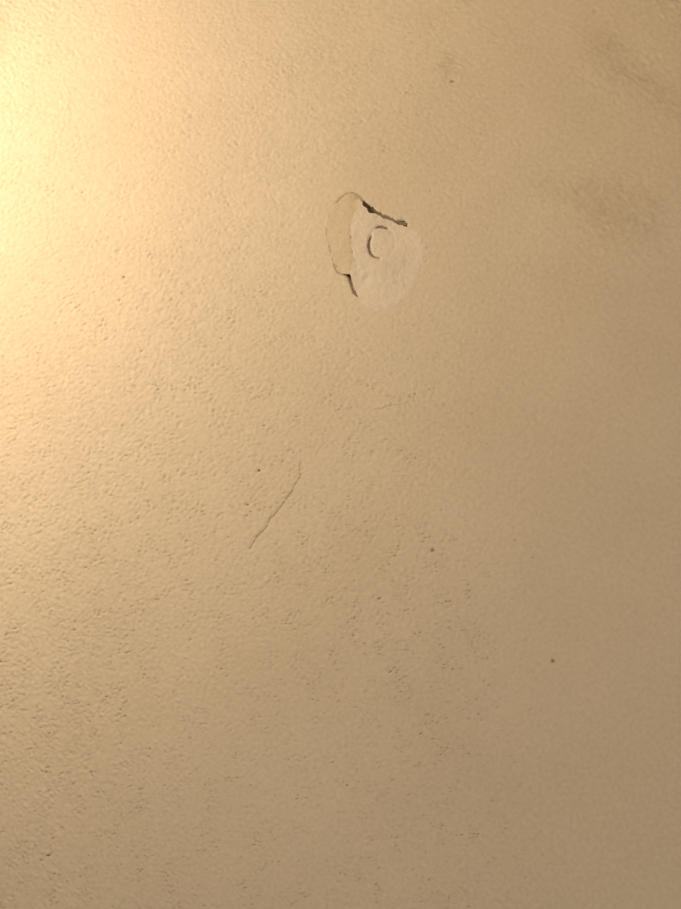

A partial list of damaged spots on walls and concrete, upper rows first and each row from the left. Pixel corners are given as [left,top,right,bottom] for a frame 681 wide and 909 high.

flaking render [326,192,426,311]